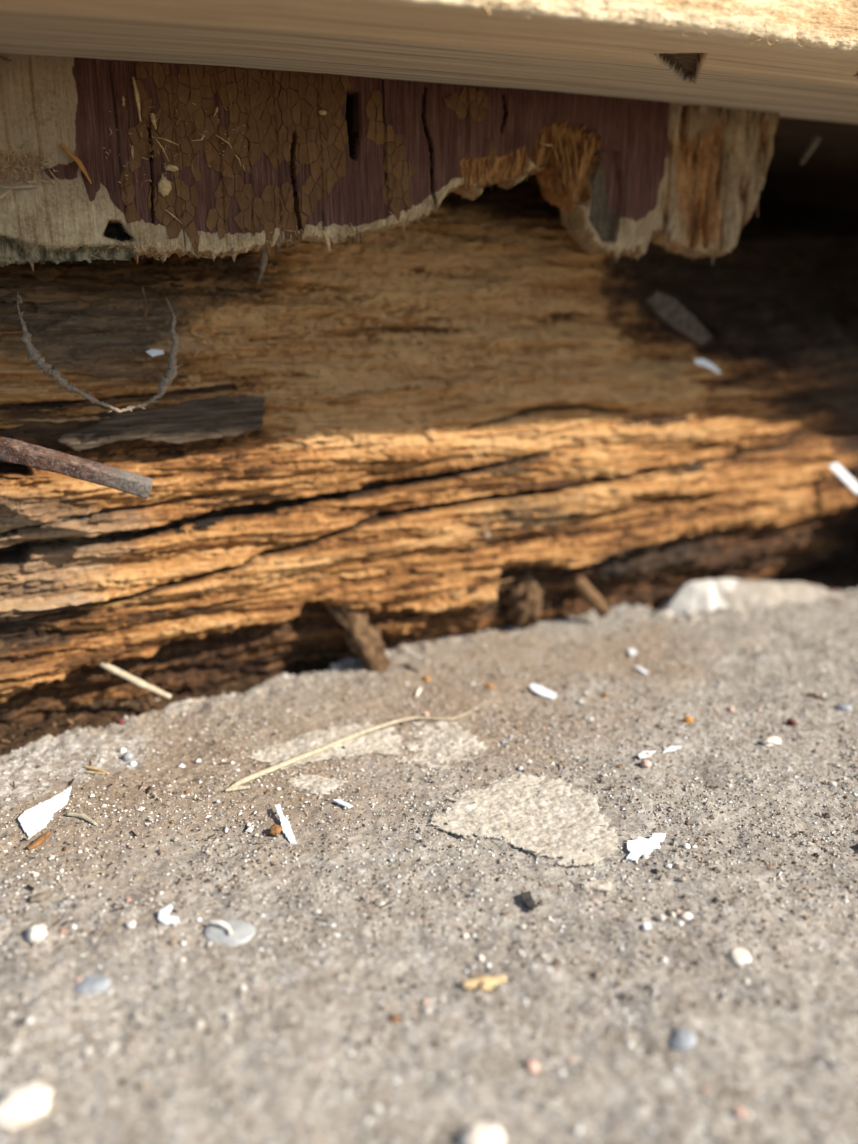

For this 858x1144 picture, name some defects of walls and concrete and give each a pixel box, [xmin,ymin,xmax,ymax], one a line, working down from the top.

spalling [654,53,704,82]
peeling [119,61,351,258]
spalling [460,121,602,204]
crack [0,396,143,410]
crack [1,471,588,562]
water stain [597,539,740,575]